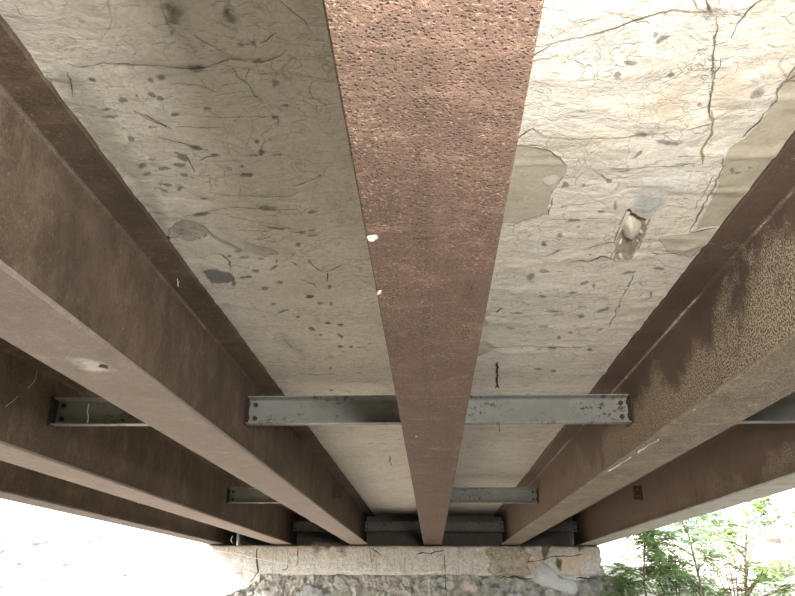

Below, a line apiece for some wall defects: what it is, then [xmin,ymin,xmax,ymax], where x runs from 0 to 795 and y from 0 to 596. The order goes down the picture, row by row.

crack [68,33,281,96]
crack [533,0,761,129]
crack [134,111,220,172]
crack [224,175,321,239]
peeling [500,143,573,237]
crack [517,129,567,166]
crack [654,155,724,254]
peeling [605,57,795,264]
damp [204,270,259,286]
crack [550,239,613,262]
crack [492,347,503,388]